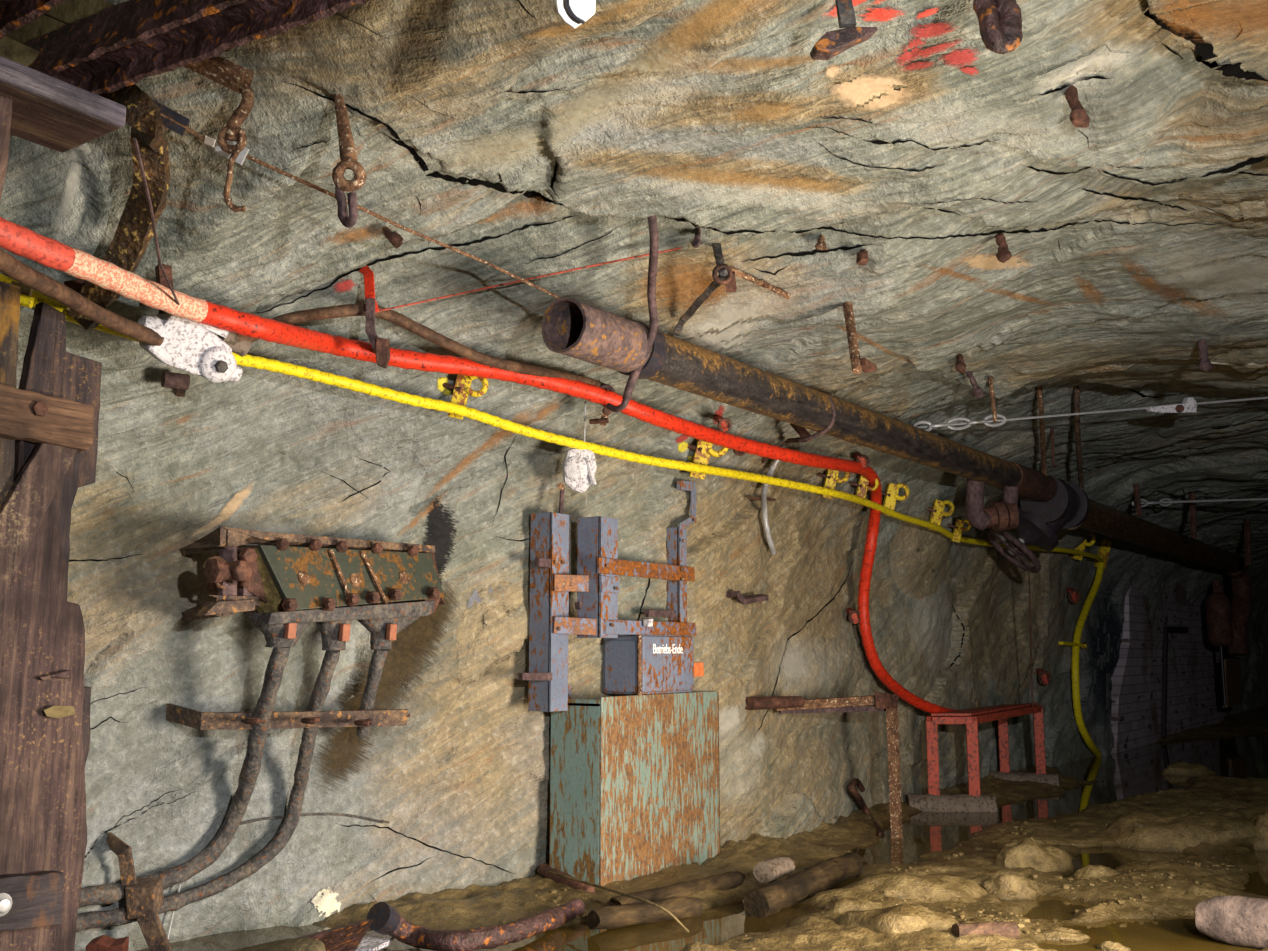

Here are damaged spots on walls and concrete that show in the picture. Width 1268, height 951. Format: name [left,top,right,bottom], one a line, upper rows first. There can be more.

crack [1144,9,1268,82]
leakage [1088,586,1124,720]